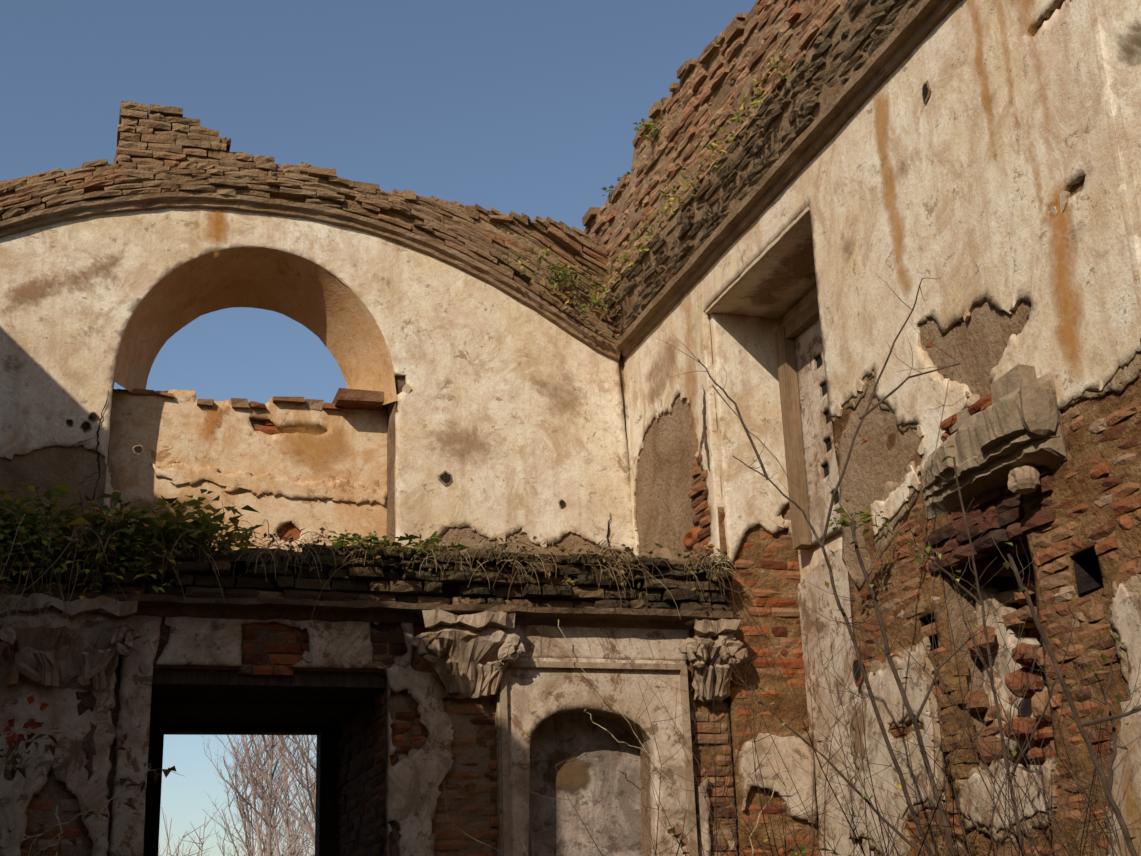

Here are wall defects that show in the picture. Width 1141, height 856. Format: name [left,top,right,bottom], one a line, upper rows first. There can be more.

flaking render [919,299,1031,406]
flaking render [0,439,123,541]
crack [69,390,109,513]
flaking render [276,522,300,540]
flaking render [829,370,957,694]
flaking render [237,622,314,677]
flaking render [431,390,820,856]
flaking render [906,338,1141,856]
flaking render [75,690,98,780]
flaking render [390,689,428,766]
flaking render [891,719,923,739]
flaking render [19,781,93,856]